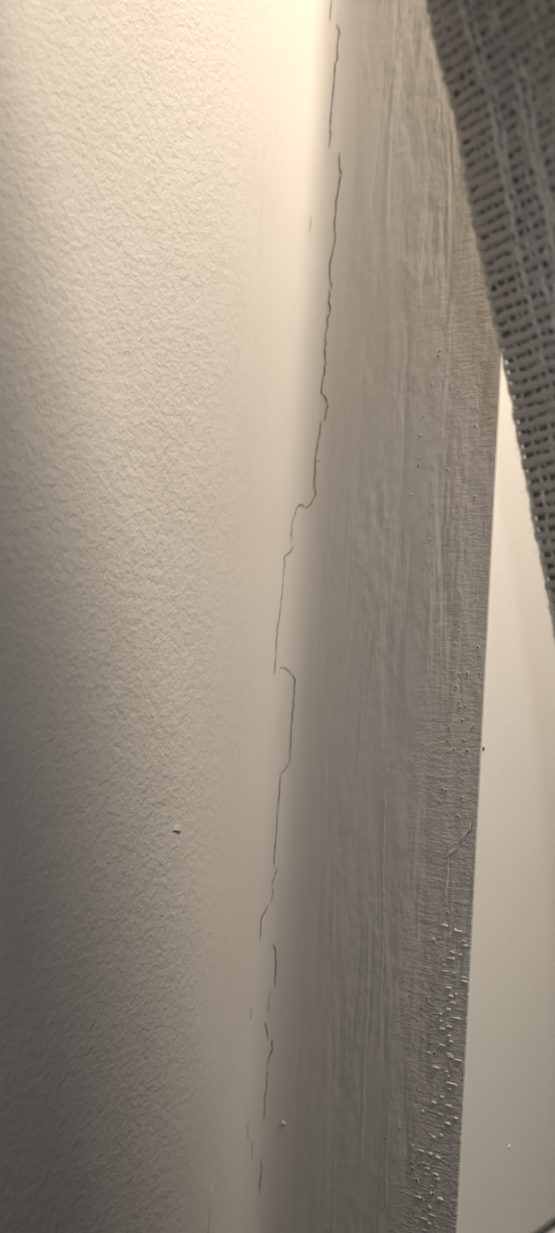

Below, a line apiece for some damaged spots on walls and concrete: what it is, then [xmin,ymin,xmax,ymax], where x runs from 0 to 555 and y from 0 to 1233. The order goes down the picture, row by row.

crack [247,2,342,1131]